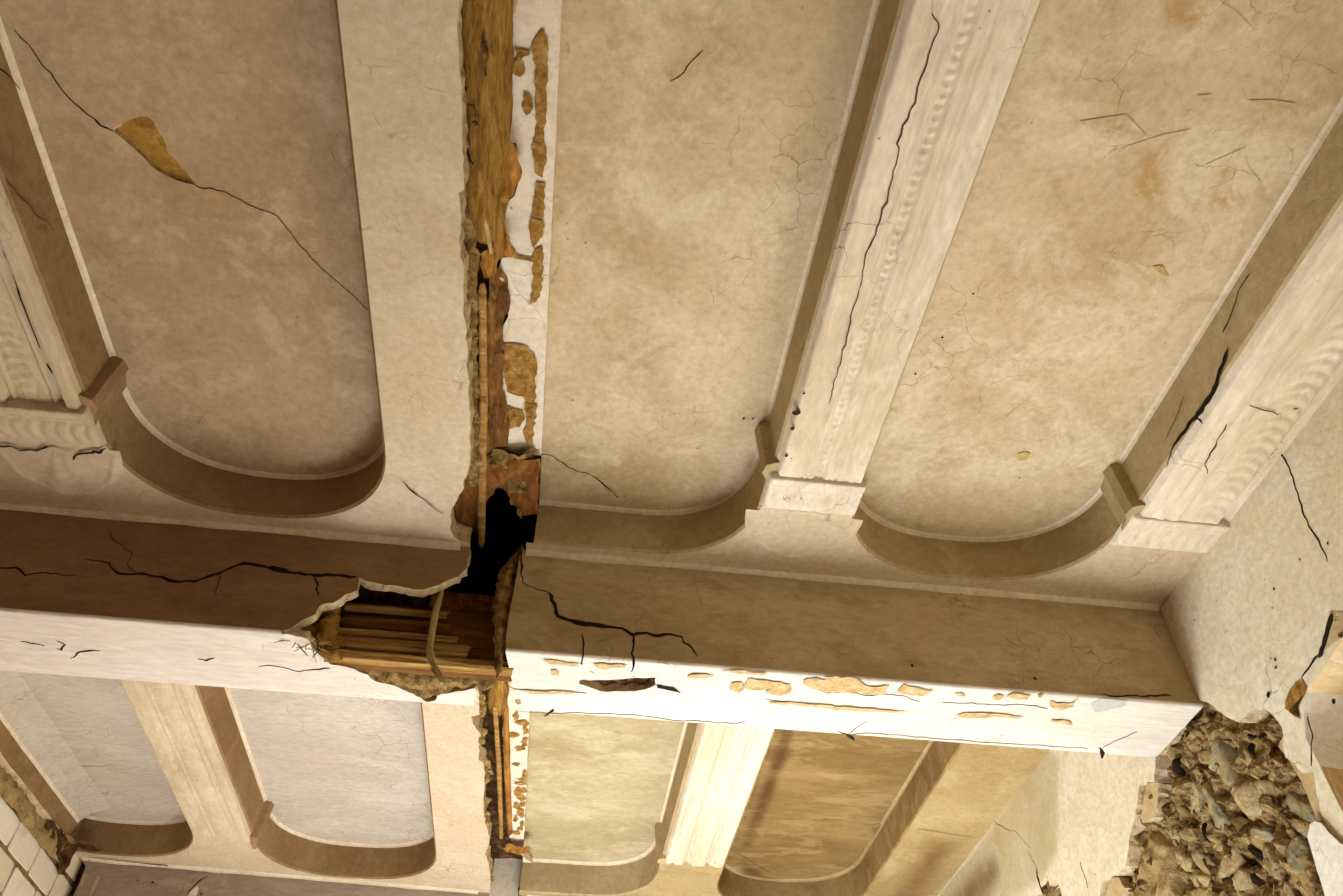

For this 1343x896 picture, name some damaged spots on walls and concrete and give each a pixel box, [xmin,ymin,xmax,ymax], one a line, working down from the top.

crack [0,31,113,132]
spalling [113,116,197,186]
crack [829,14,940,403]
spalling [274,0,680,891]
crack [1166,273,1327,561]
crack [0,530,356,595]
crack [504,549,786,724]
spalling [1318,612,1343,658]
peeling [688,670,935,713]
crack [829,692,1135,759]
peeling [957,694,1127,725]
spalling [1100,679,1343,896]